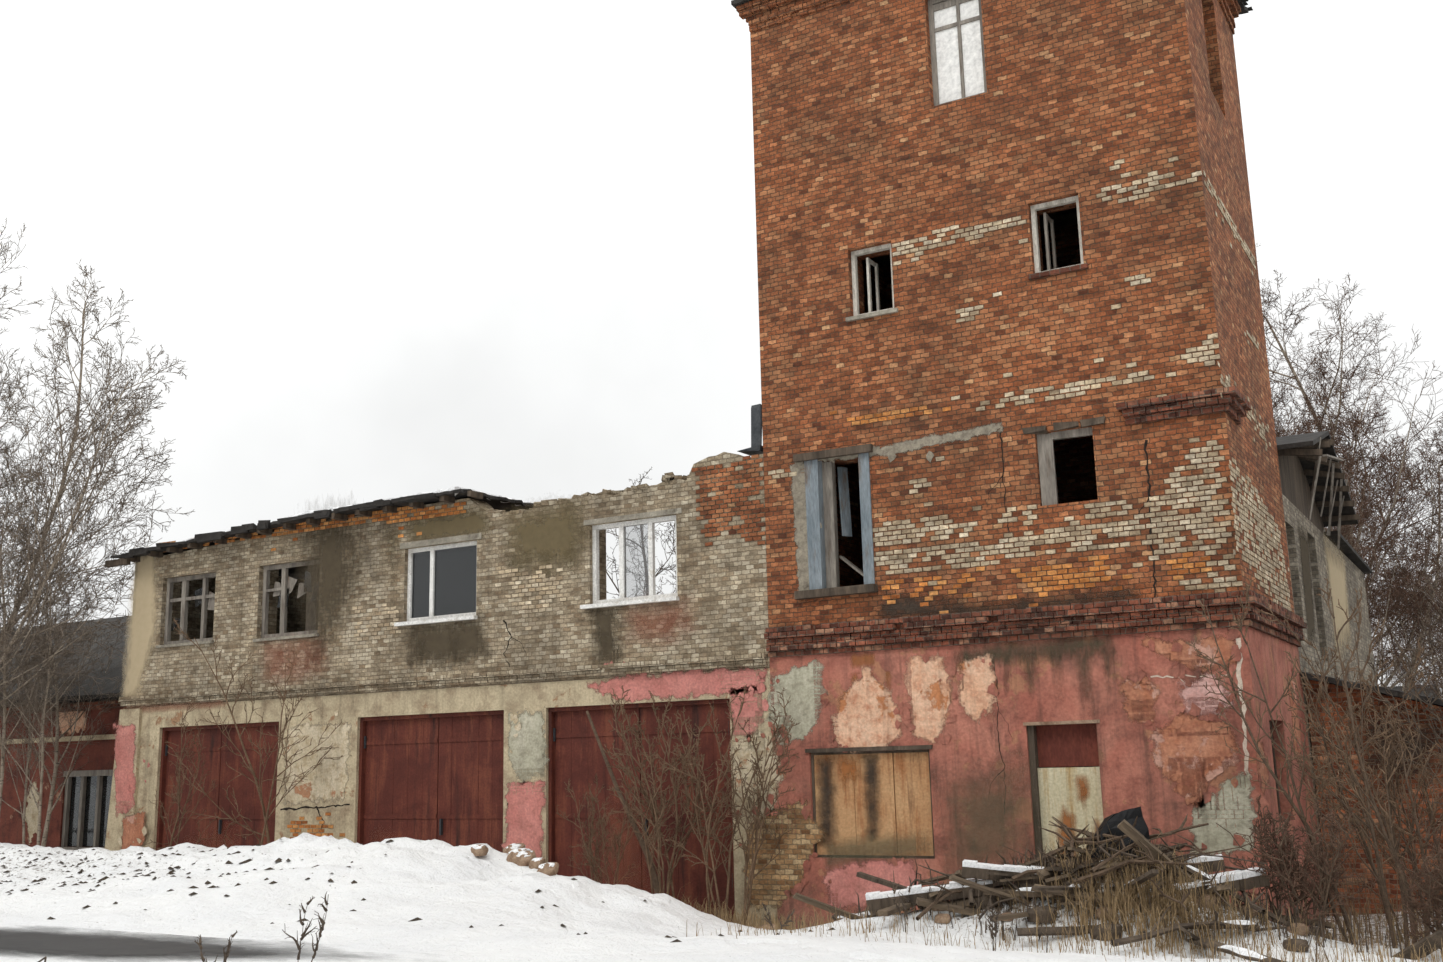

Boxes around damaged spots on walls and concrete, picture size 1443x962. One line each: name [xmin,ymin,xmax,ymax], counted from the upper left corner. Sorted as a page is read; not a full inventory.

flaking render [59,710,91,736]
peeling [113,723,150,849]
flaking render [587,653,999,911]
flaking render [1118,627,1270,856]